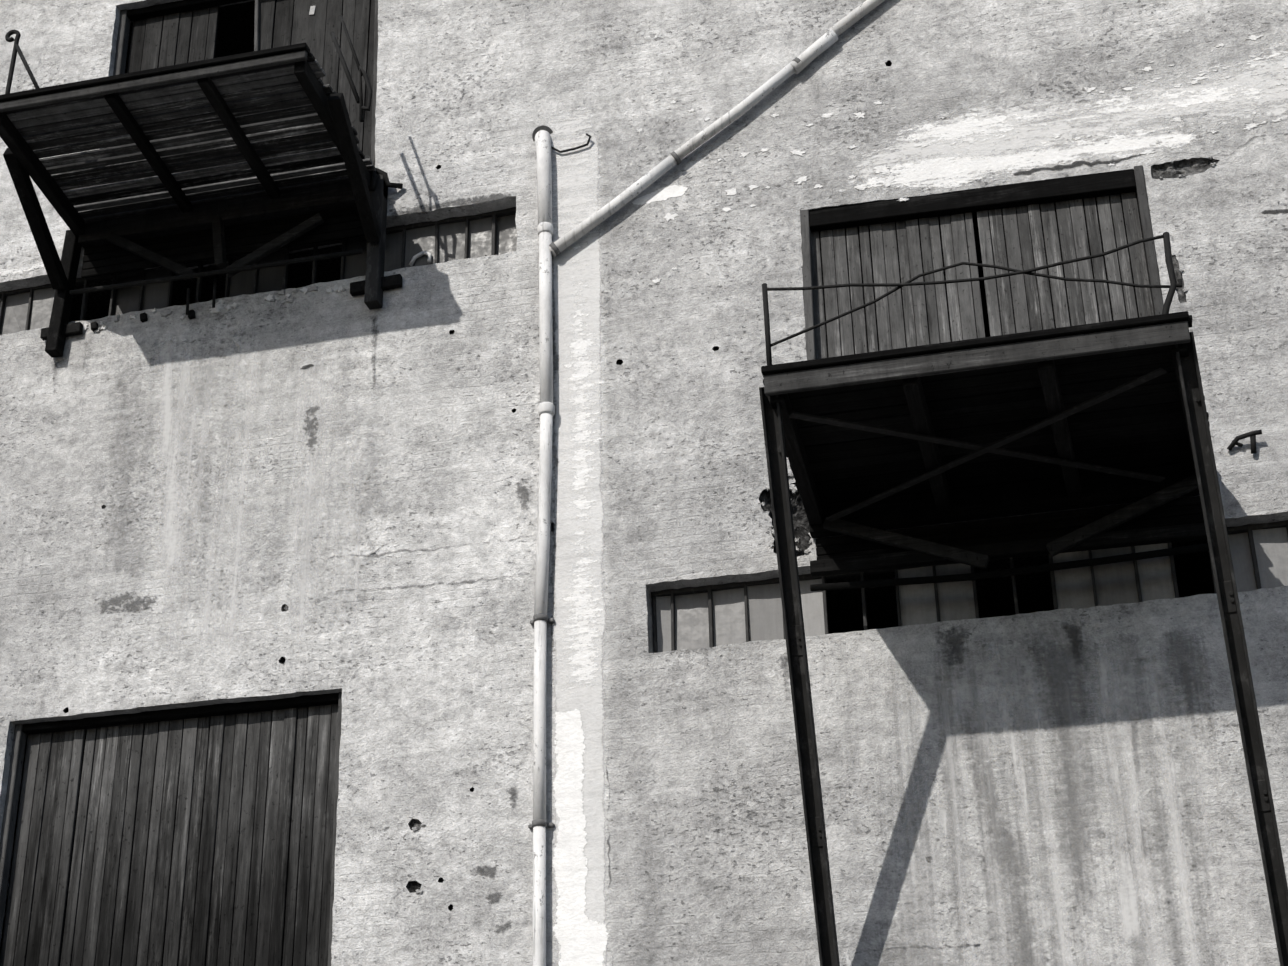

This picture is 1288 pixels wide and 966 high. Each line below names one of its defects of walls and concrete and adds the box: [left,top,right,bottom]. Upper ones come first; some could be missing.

peeling [793,35,1288,202]
peeling [632,185,688,222]
peeling [722,185,771,213]
peeling [540,104,606,924]
spalling [759,485,776,553]
spalling [788,471,812,557]
leakage [938,628,965,663]
leakage [1036,624,1084,872]
leakage [1110,756,1148,936]